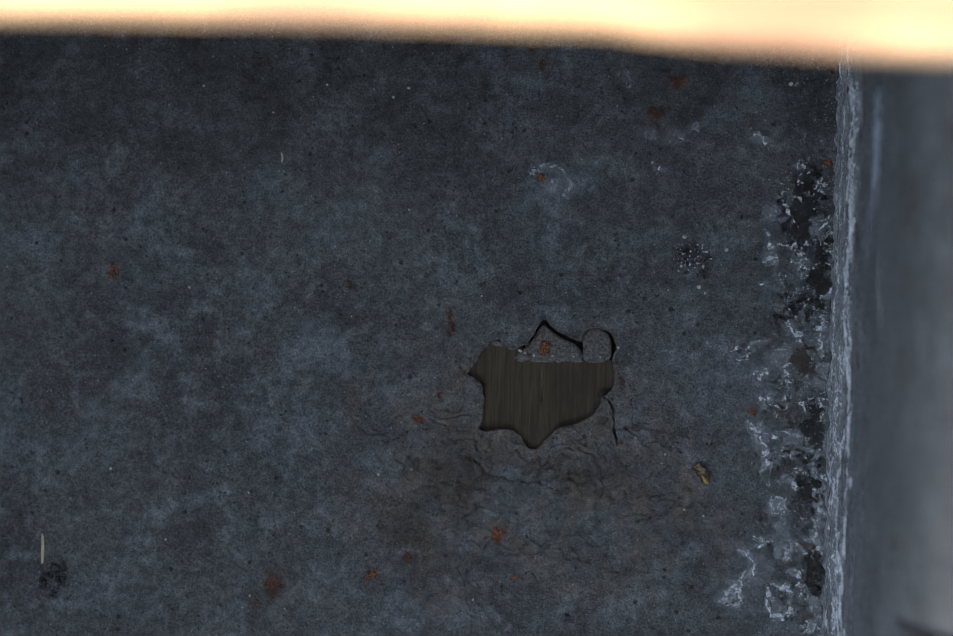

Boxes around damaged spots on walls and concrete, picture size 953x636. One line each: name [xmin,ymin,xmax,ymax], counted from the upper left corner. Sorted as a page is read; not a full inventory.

peeling [514,325,612,363]
damp [718,54,882,636]